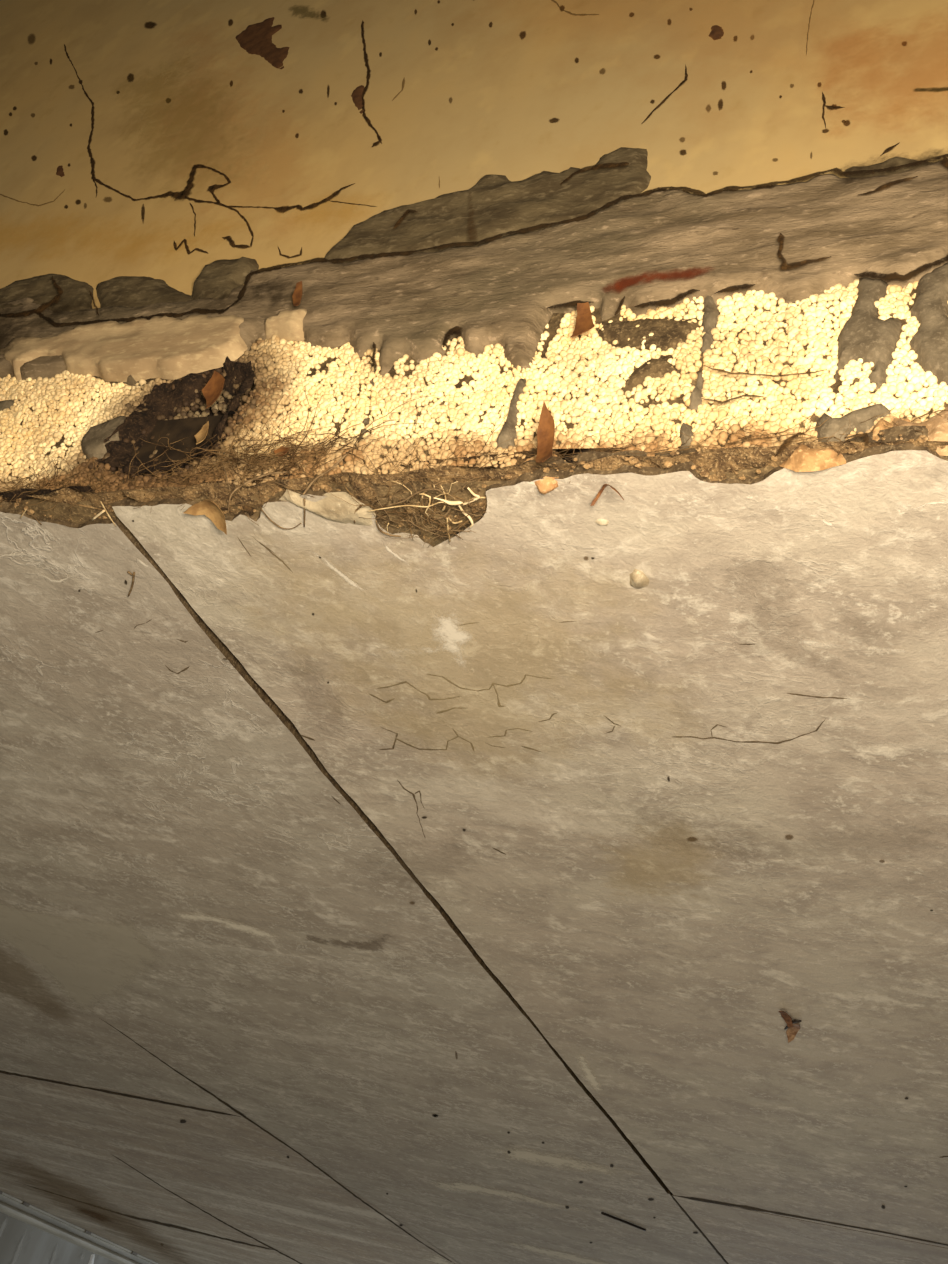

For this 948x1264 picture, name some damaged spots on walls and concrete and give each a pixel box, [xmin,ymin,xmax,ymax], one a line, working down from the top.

crack [361,20,405,147]
crack [0,44,948,327]
spalling [0,279,948,549]
crack [238,536,293,573]
crack [370,674,558,753]
crack [398,781,425,837]